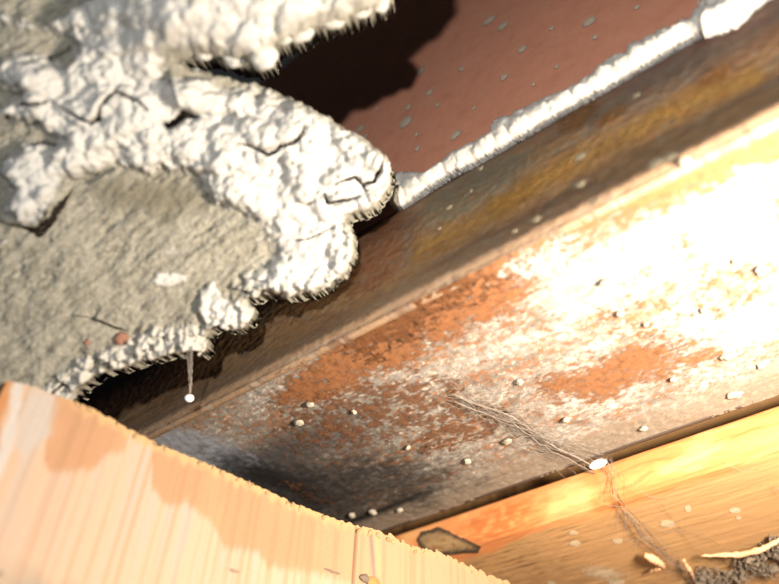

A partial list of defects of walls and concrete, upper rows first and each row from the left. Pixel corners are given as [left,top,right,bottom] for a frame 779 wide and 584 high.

rust [561,101,595,131]
rust [266,129,779,459]
spalling [113,332,130,345]
damp [220,456,447,514]